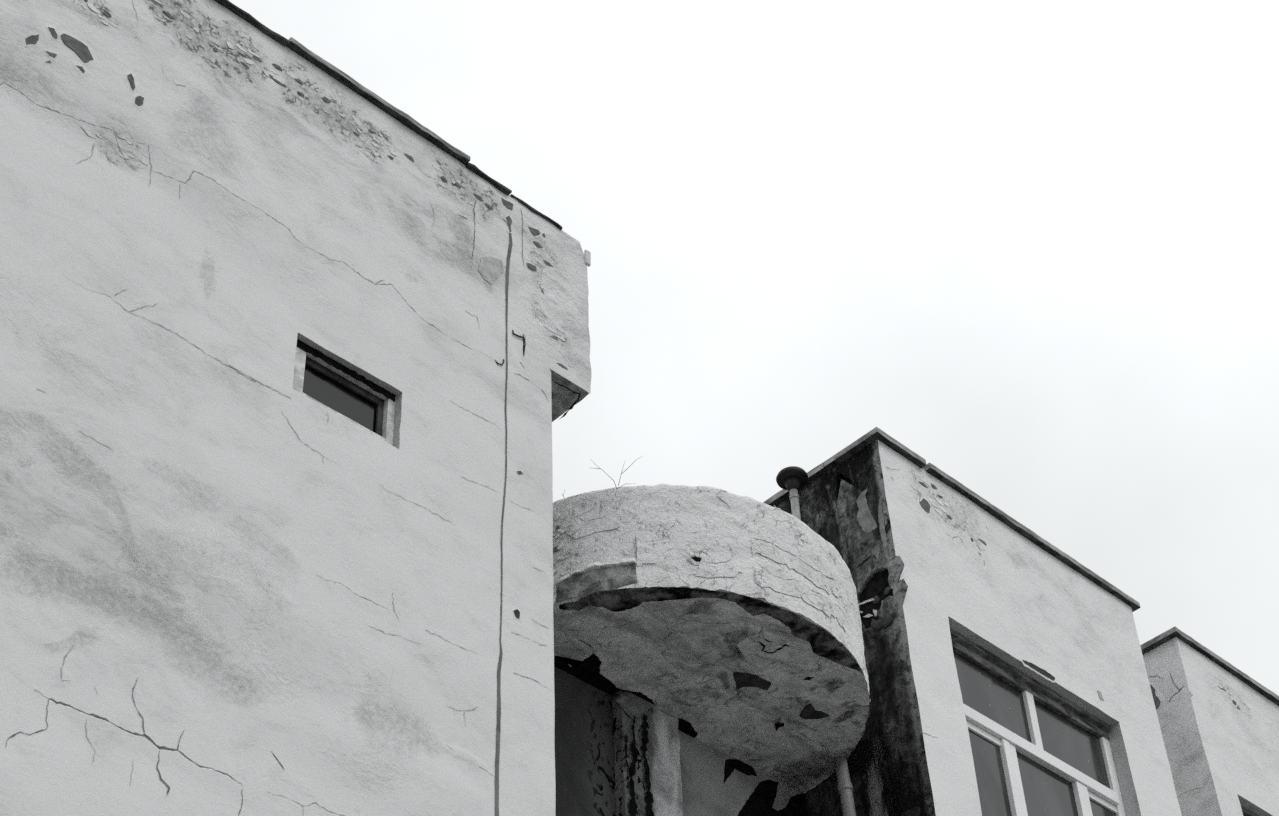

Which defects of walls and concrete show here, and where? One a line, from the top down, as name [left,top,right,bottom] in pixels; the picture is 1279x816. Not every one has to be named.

flaking render [21,25,98,79]
flaking render [123,70,147,111]
flaking render [150,0,515,233]
crack [0,82,649,816]
water stain [813,441,876,512]
crack [635,536,658,564]
flaking render [553,512,862,674]
spalling [855,487,908,645]
flaking render [554,650,701,738]
flaking render [731,670,773,691]
flaking render [722,756,808,816]
water stain [848,740,925,816]